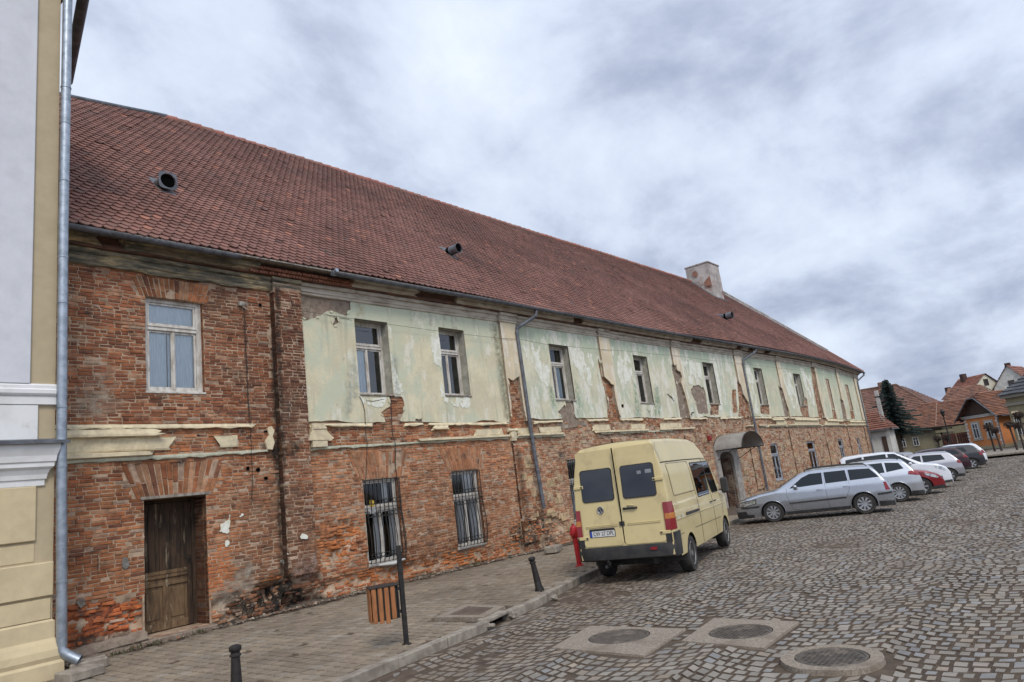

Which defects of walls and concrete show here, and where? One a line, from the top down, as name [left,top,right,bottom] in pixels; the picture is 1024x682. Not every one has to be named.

spalling [301,295,350,327]
spalling [359,354,405,438]
spalling [507,377,527,428]
spalling [557,401,587,429]
peeling [569,347,648,423]
spalling [671,355,769,418]
spalling [67,596,142,643]
leakage [216,569,323,619]